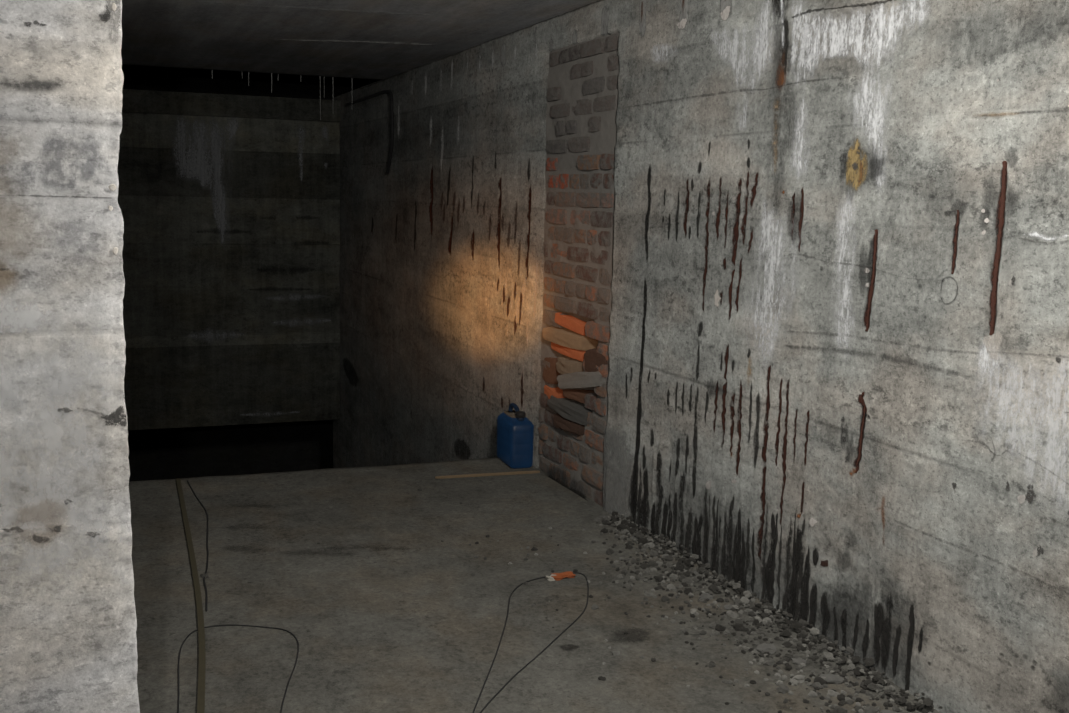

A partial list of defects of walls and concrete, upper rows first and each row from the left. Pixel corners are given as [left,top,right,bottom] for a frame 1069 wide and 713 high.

water stain [716,0,924,81]
water stain [1,80,59,90]
water stain [793,102,805,172]
water stain [754,212,784,349]
corrosion [662,139,810,559]
corrosion [797,482,818,527]
water stain [633,430,923,691]